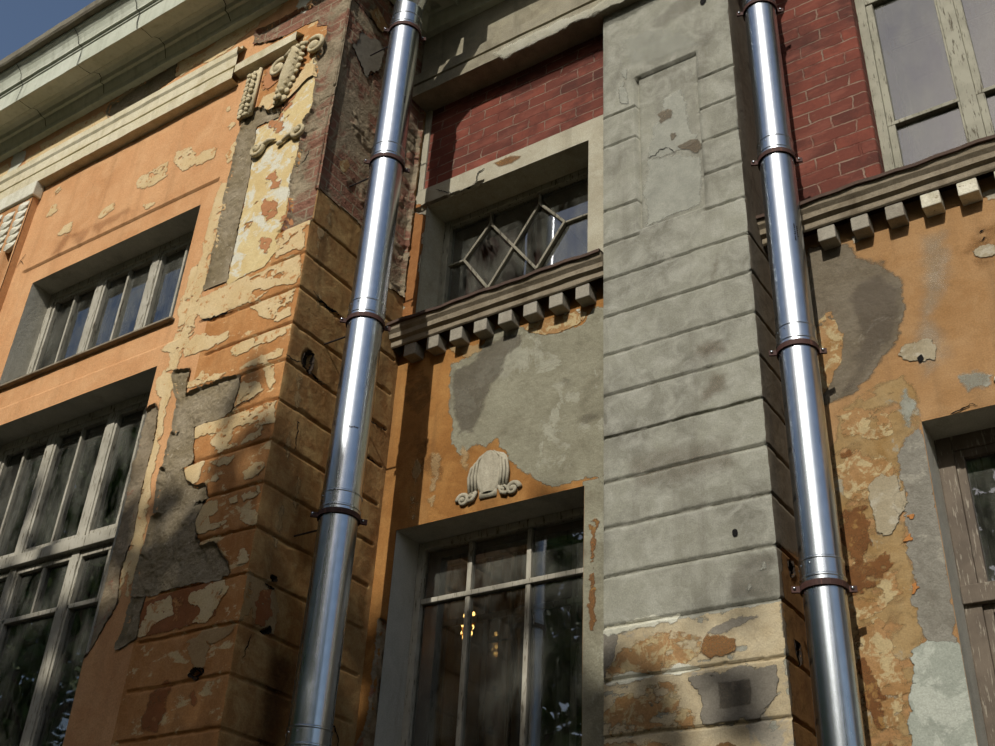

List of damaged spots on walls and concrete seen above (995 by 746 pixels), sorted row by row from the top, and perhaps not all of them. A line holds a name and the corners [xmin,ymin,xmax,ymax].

flaking render [415,40,425,75]
flaking render [388,100,484,317]
flaking render [0,0,394,658]
peeling [524,309,587,335]
peeling [816,311,844,395]
peeling [898,338,937,361]
peeling [958,373,991,390]
peeling [831,375,923,746]
peeling [587,518,817,746]